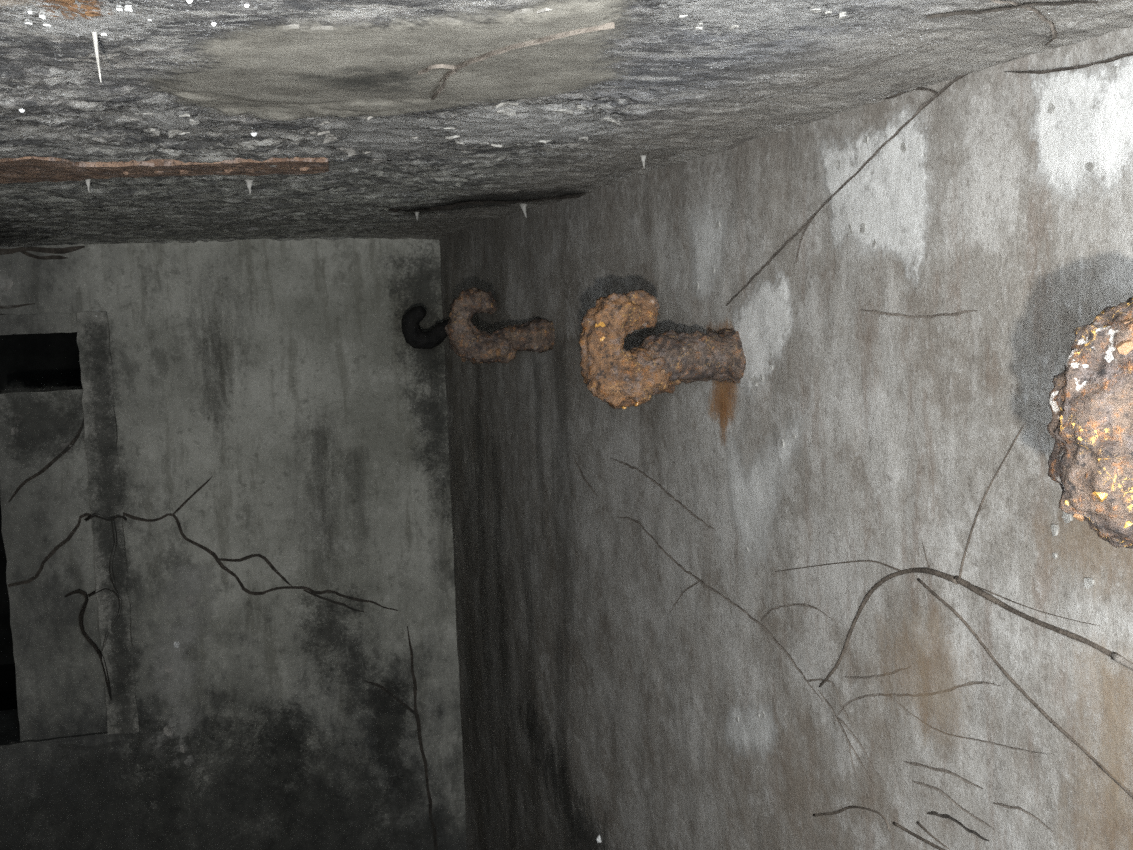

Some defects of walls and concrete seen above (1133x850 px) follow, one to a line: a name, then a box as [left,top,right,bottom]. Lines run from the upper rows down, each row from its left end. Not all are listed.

corrosion [0,156,329,184]
crack [726,72,971,306]
crack [861,309,977,318]
corrosion [711,381,735,432]
crack [8,477,438,850]